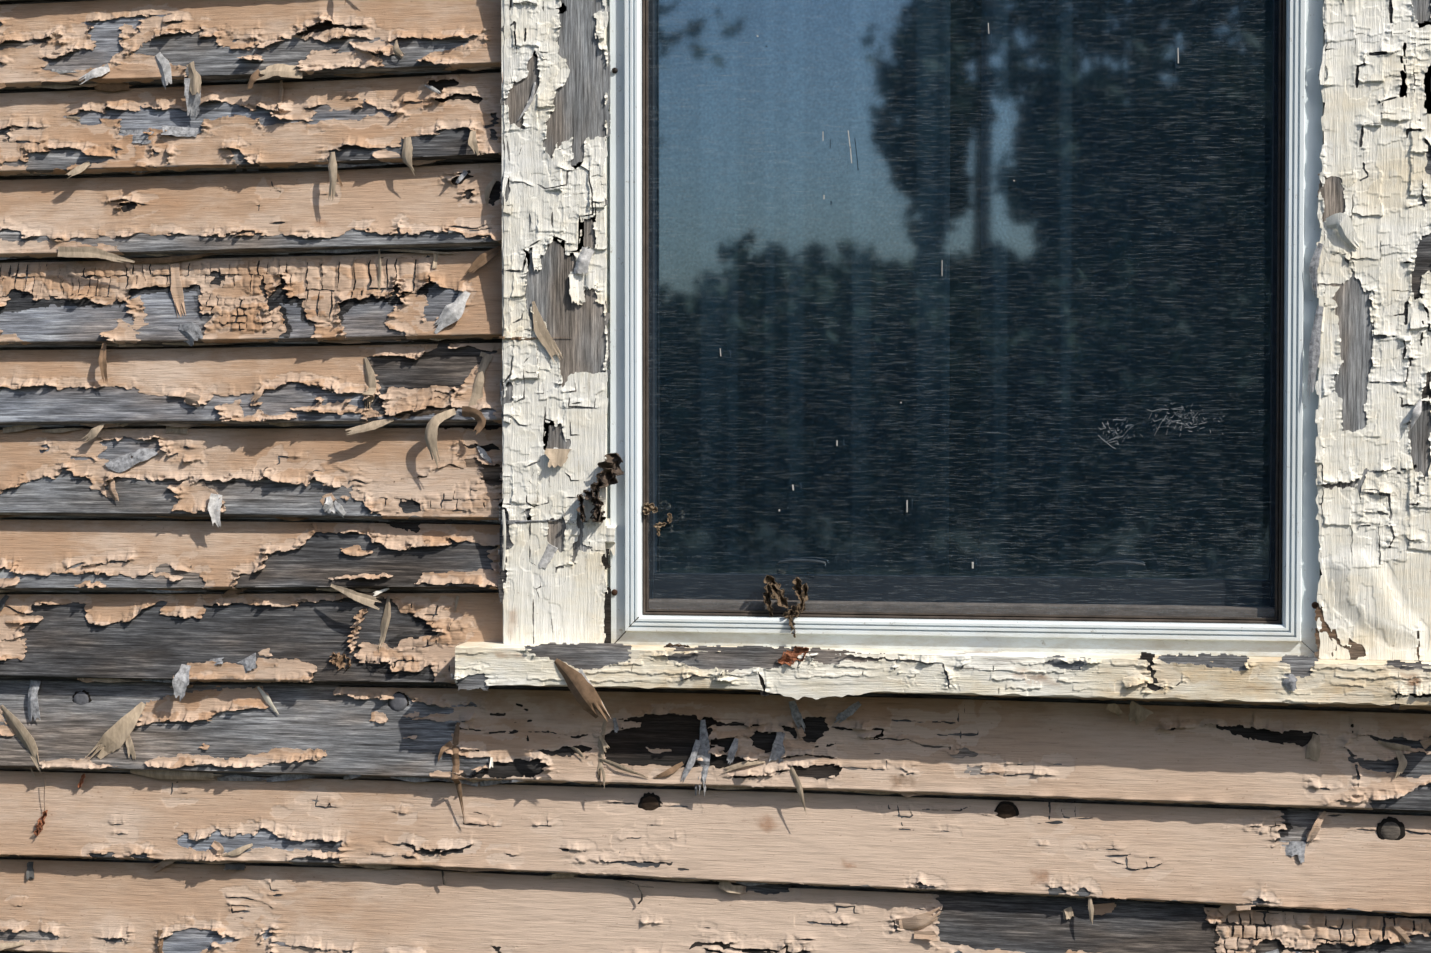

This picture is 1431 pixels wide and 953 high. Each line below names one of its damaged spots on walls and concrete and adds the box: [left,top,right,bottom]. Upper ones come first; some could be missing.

peeling [1307,0,1431,560]
crack [0,129,608,644]
peeling [0,0,1076,873]
peeling [1033,595,1431,863]
peeling [0,918,71,952]
peeling [90,915,363,953]
peeling [543,837,801,907]
peeling [589,912,821,953]
peeling [882,871,1224,953]
peeling [1237,887,1283,908]
crack [1213,904,1431,953]
peeling [1249,913,1431,953]